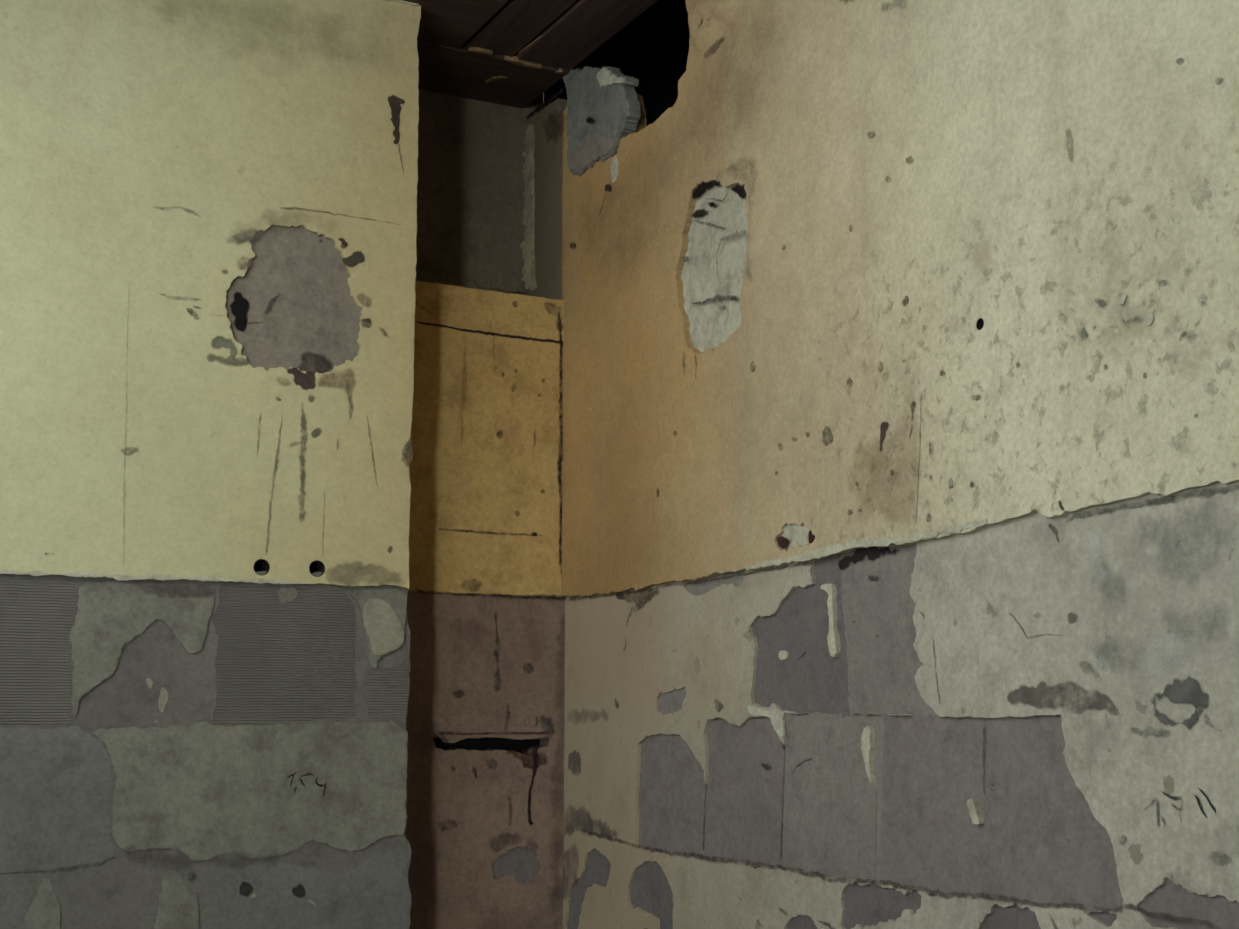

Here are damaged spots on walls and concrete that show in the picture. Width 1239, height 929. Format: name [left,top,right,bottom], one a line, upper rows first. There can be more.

peeling [605,156,618,192]
spalling [339,238,365,267]
spalling [681,180,748,367]
peeling [207,336,249,366]
spalling [287,368,355,391]
water stain [295,397,321,520]
crack [1071,486,1239,520]
spalling [777,524,815,550]
peeling [363,599,404,656]
spalling [630,543,1123,929]
crack [528,747,538,825]
crack [583,830,1213,927]